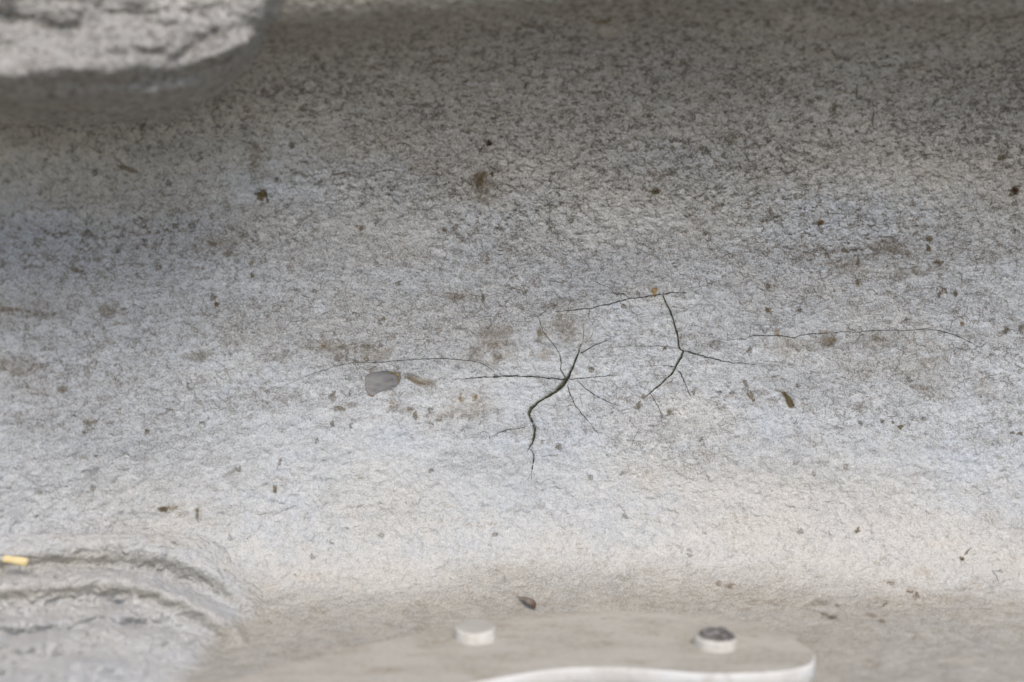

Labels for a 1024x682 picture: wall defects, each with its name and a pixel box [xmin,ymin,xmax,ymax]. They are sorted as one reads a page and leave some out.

crack [286,281,981,478]